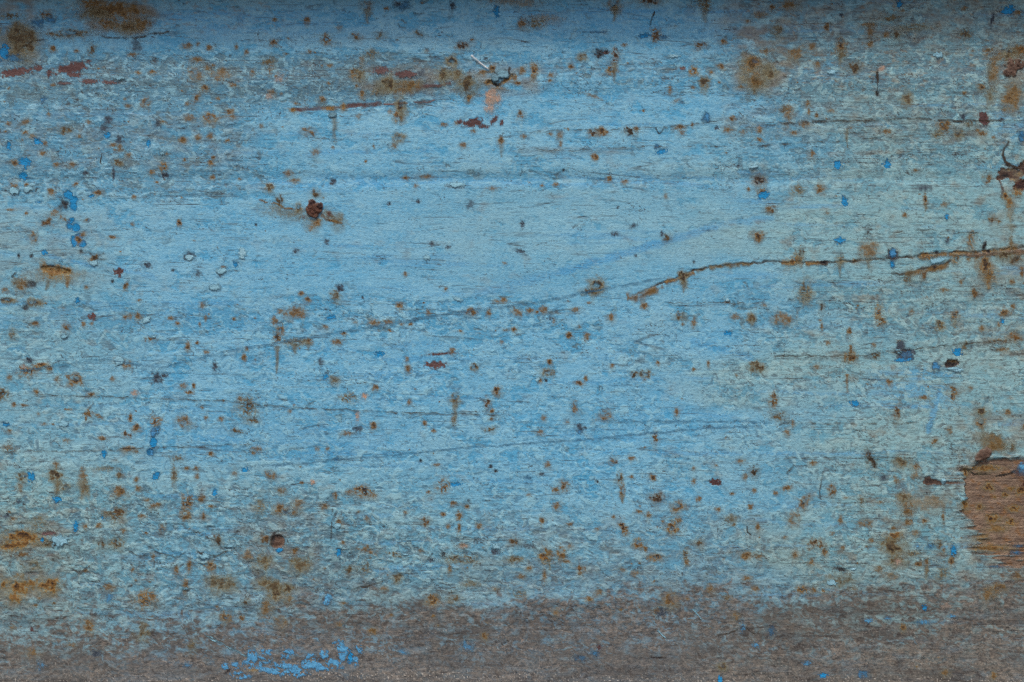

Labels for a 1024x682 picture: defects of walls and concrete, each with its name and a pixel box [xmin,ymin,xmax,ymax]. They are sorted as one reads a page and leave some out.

rust [0,13,95,70]
rust [350,32,419,148]
rust [439,39,553,102]
spalling [996,131,1024,208]
rust [261,183,343,230]
crack [626,230,1024,303]
rust [466,298,555,342]
rust [636,467,702,534]
peeling [923,447,1024,577]
rust [0,511,60,606]
rust [421,479,476,626]
rust [509,539,585,597]